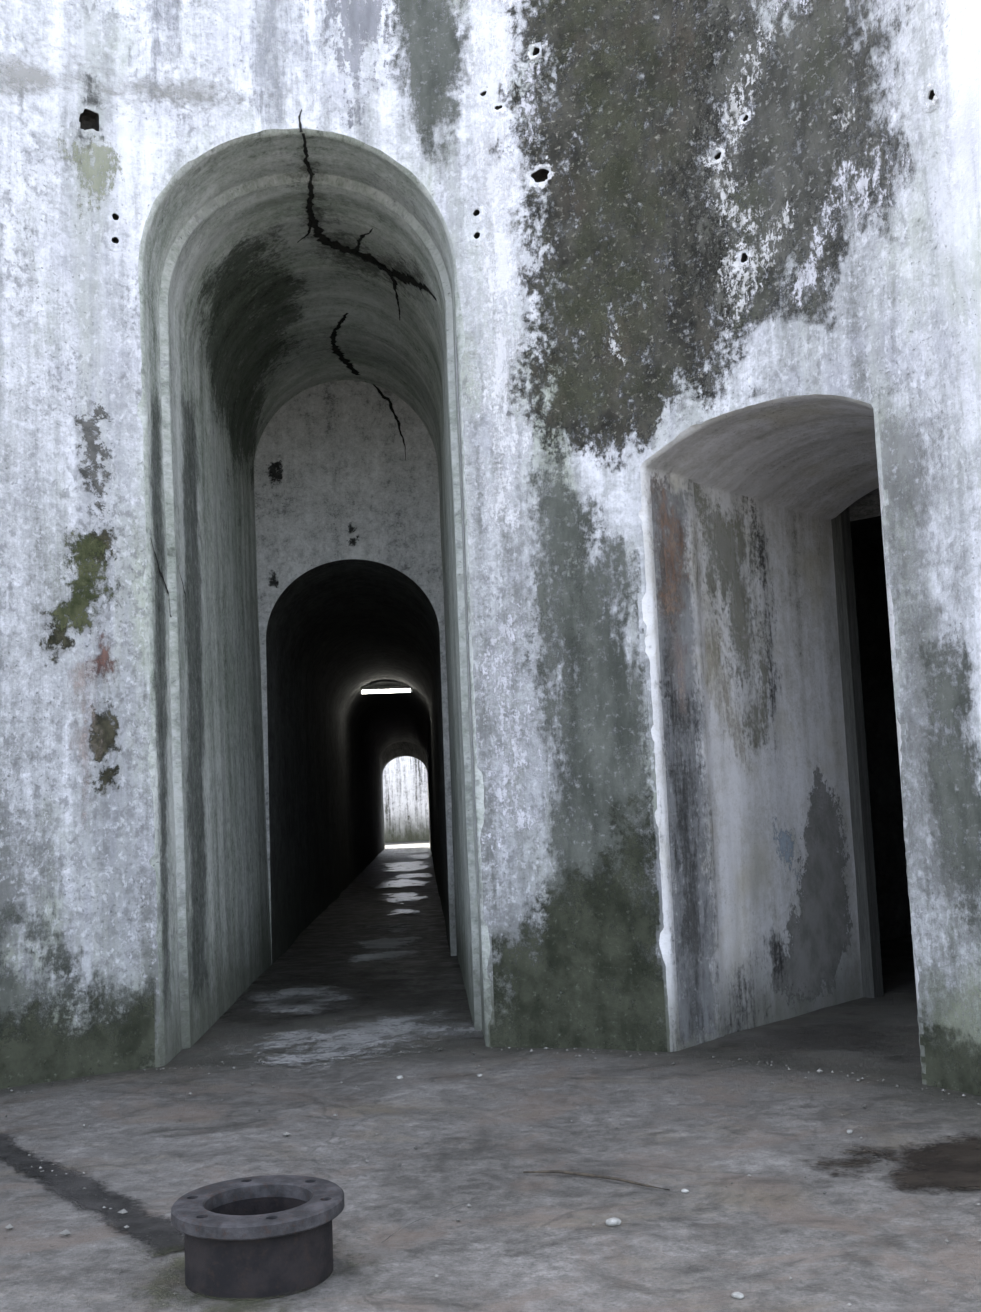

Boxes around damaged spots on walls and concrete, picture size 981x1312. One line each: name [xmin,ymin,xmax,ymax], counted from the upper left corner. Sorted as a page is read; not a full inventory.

spalling [72,100,107,141]
water stain [251,0,292,117]
crack [297,109,437,320]
crack [330,313,406,460]
water stain [307,0,909,1058]
water stain [0,402,170,1035]
water stain [183,402,209,994]
water stain [879,412,981,947]
water stain [224,922,480,1073]
water stain [805,1132,981,1194]